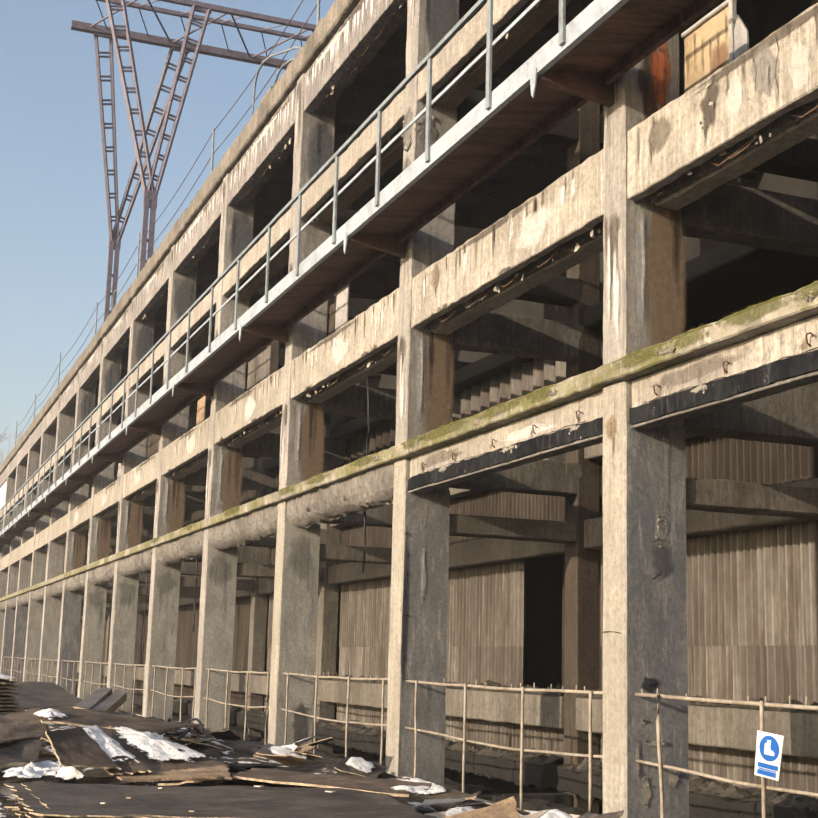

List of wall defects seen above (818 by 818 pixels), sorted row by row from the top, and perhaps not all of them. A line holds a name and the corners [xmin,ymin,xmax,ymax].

rust [652,42,671,108]
peeling [699,79,717,138]
spalling [647,98,818,204]
water stain [57,0,395,426]
spalling [426,221,603,331]
water stain [604,215,619,325]
water stain [636,204,685,346]
water stain [658,357,734,392]
water stain [65,500,142,569]
water stain [154,477,185,533]
water stain [206,444,242,512]